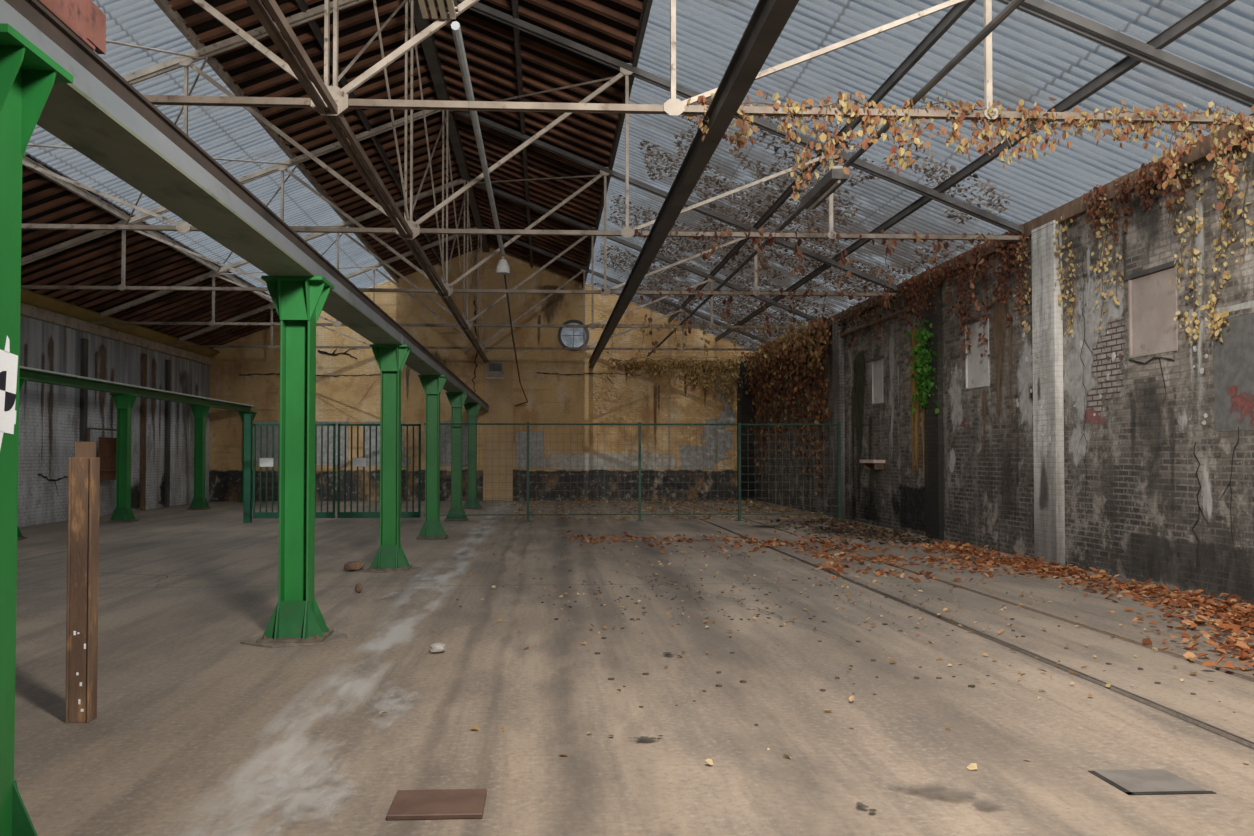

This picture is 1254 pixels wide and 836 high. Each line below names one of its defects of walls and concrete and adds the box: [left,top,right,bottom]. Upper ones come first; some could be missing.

peeling [948,363,964,473]
peeling [1016,325,1051,507]
peeling [1063,270,1129,466]